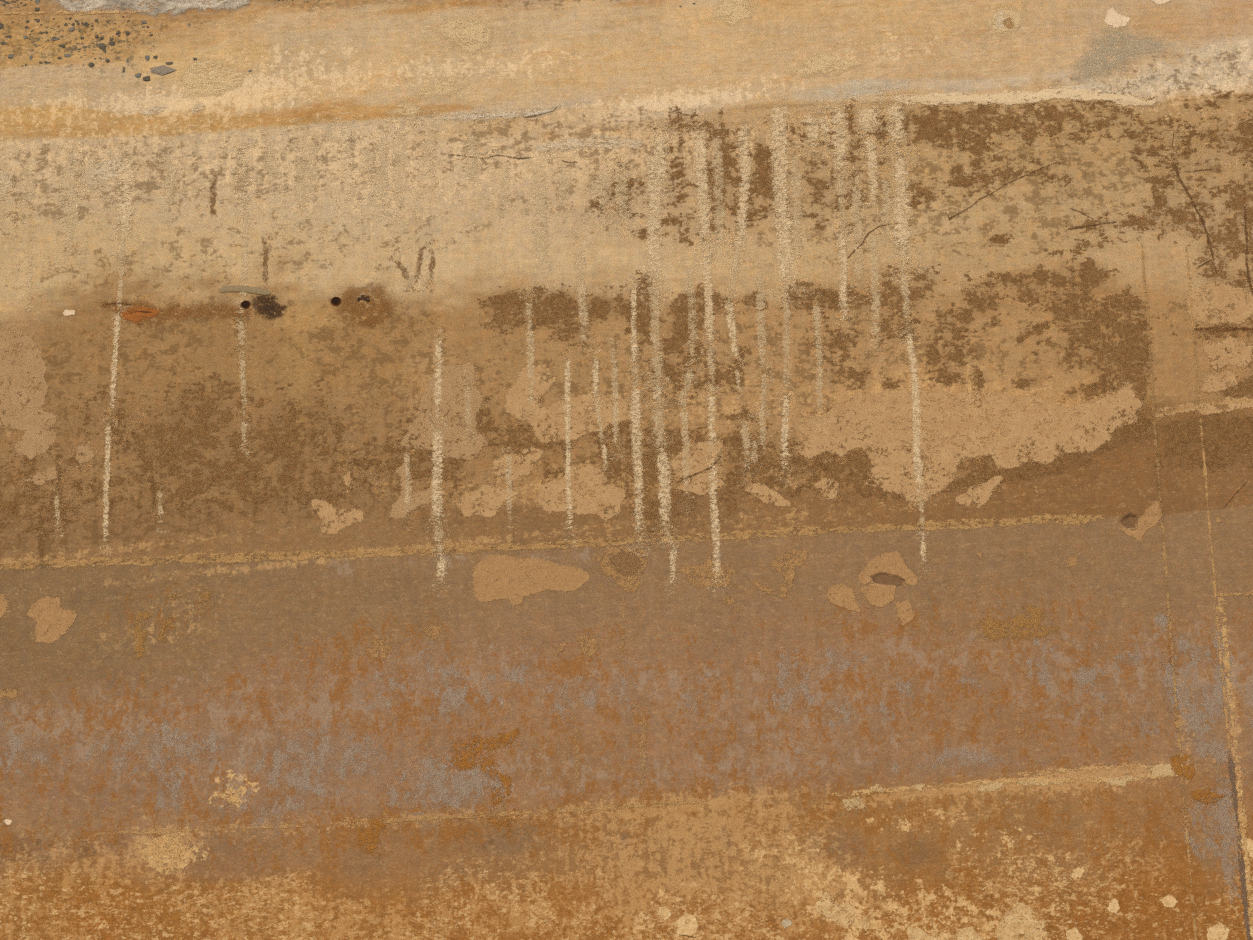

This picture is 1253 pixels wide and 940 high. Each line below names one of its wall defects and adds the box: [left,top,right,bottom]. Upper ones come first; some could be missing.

water stain [48,138,143,556]
water stain [206,32,1160,597]
peeling [792,280,1253,509]
water stain [36,460,63,558]
peeling [312,498,364,535]
spalling [472,546,648,606]
spalling [826,551,919,626]
rust [449,730,518,825]
rust [1170,754,1224,803]
peeling [657,906,699,936]
peeling [907,900,1047,940]
peeling [1207,922,1229,940]